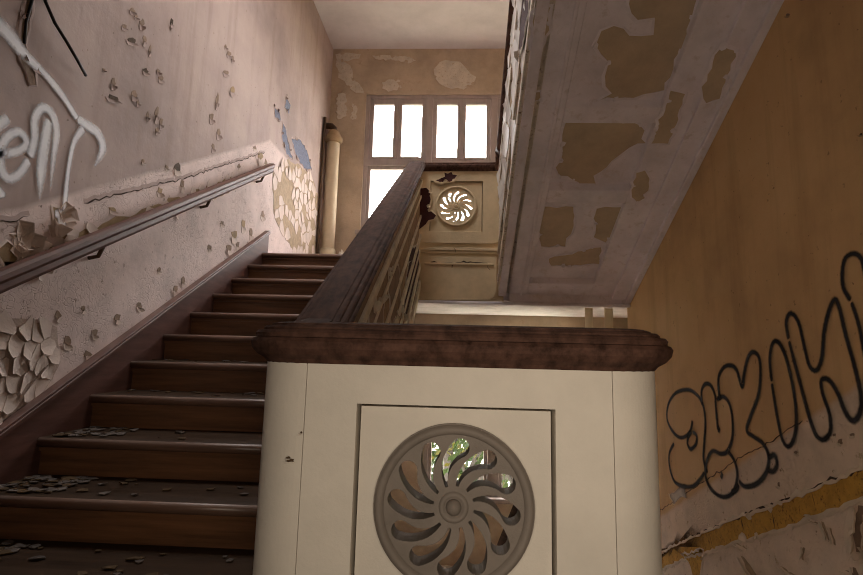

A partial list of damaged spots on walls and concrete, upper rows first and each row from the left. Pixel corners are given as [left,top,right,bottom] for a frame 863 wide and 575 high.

peeling [102,68,165,136]
peeling [121,8,152,57]
peeling [432,59,478,90]
peeling [496,0,536,223]
peeling [553,0,739,184]
flaking render [0,163,241,268]
crack [83,150,265,204]
peeling [220,220,254,255]
peeling [253,95,318,254]
peeling [538,204,622,268]
peeling [0,293,73,425]
peeling [662,470,863,575]